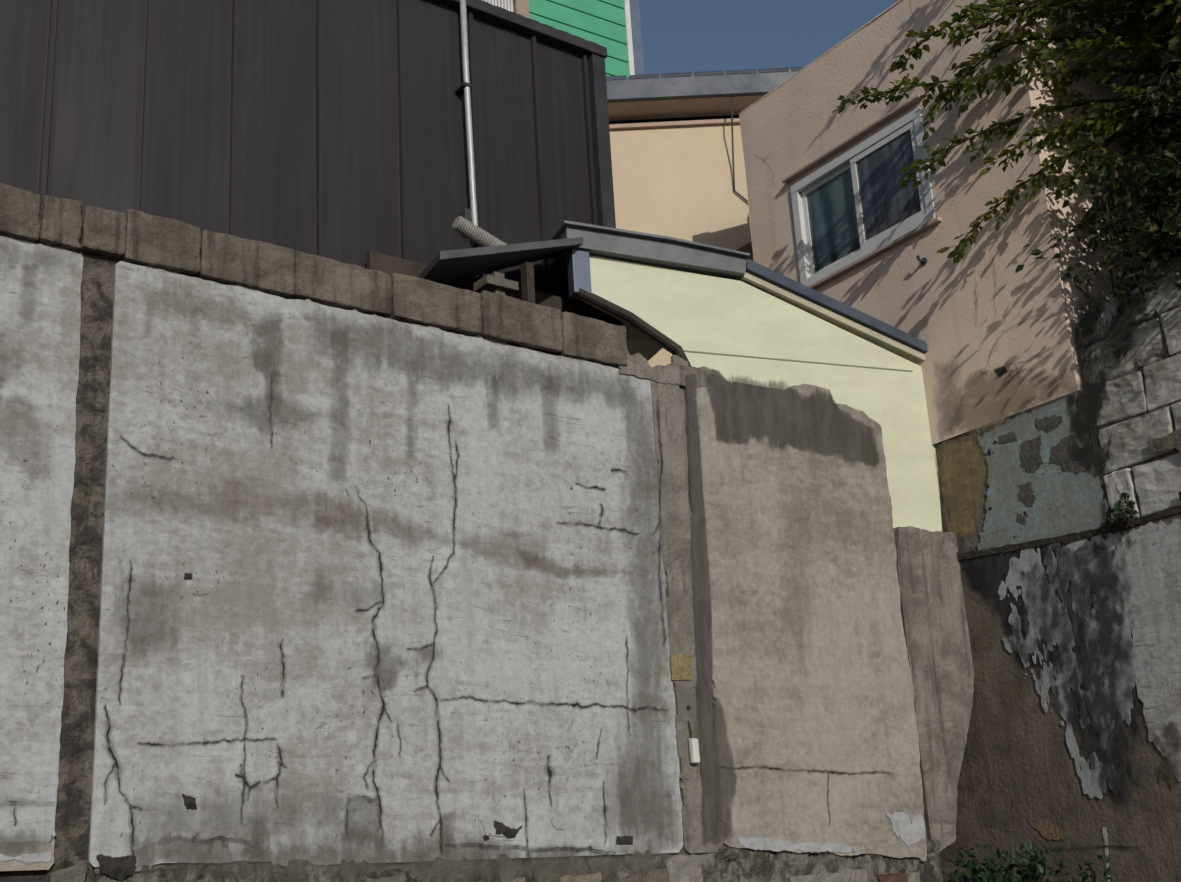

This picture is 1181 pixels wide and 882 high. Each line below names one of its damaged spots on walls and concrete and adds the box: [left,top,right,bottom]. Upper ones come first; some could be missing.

crack [121,436,175,459]
crack [104,560,287,867]
crack [346,487,401,832]
crack [407,398,666,863]
crack [719,766,890,825]
water stain [951,368,1078,431]
peeling [977,391,1181,799]